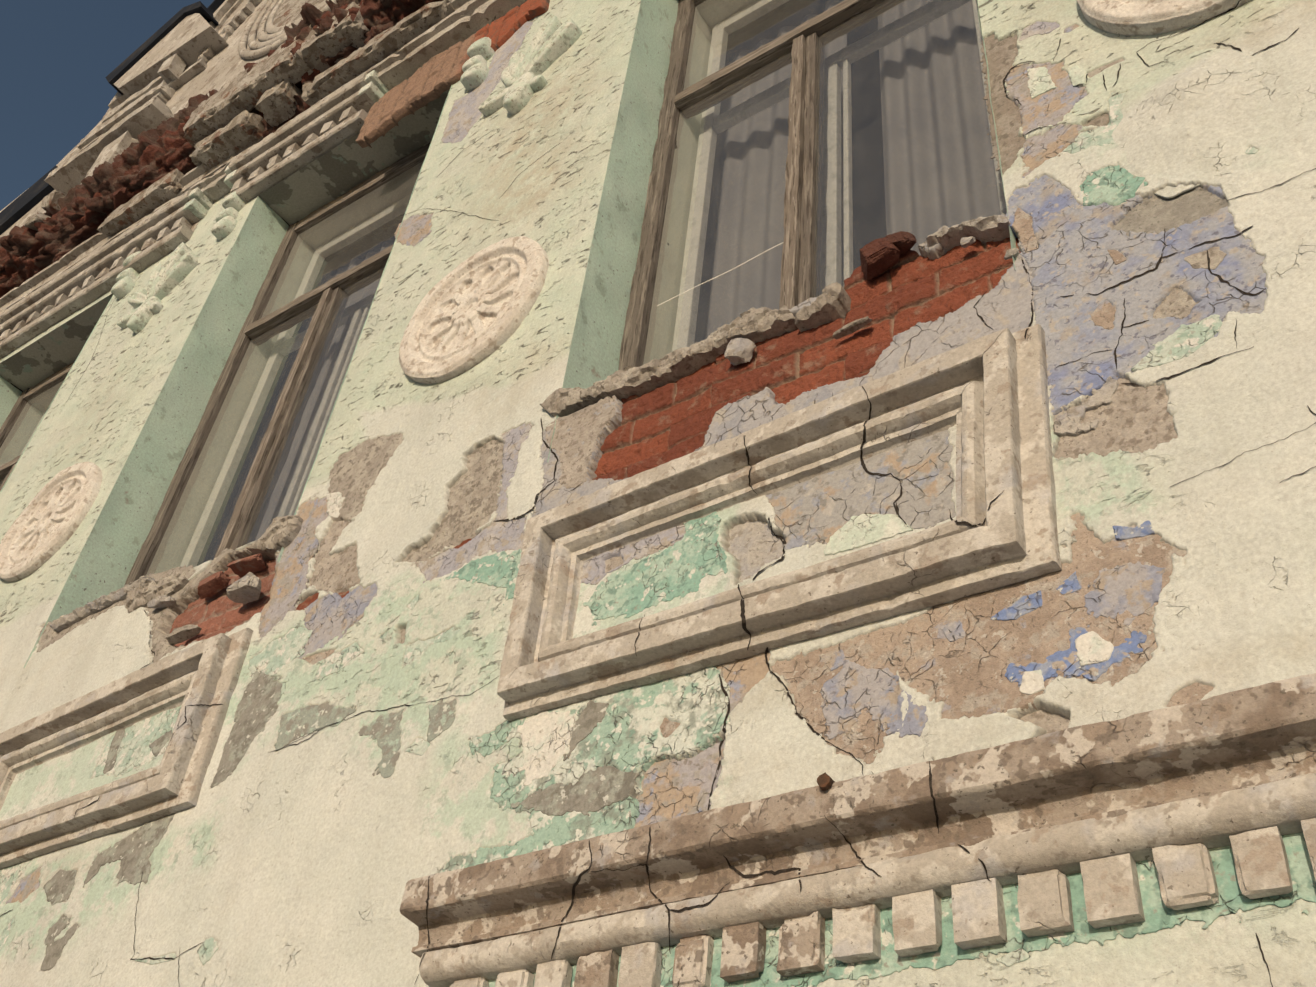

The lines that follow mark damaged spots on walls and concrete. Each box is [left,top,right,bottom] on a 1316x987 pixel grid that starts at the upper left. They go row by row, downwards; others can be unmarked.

spalling [355,0,550,148]
peeling [394,213,433,246]
spalling [402,21,1267,626]
crack [1021,226,1266,387]
spalling [37,433,403,682]
crack [737,437,863,774]
crack [708,674,732,810]
peeling [439,513,1187,873]
peeling [41,914,80,971]
crack [130,872,204,982]
crack [551,826,802,960]
crack [824,815,882,877]